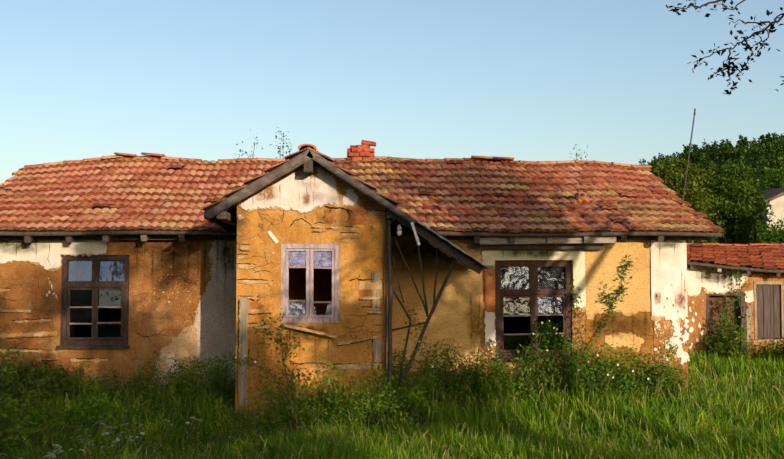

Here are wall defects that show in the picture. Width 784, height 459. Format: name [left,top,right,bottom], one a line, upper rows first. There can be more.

flaking render [238,165,378,225]
crack [268,206,352,228]
spalling [0,240,212,393]
flaking render [478,240,784,393]